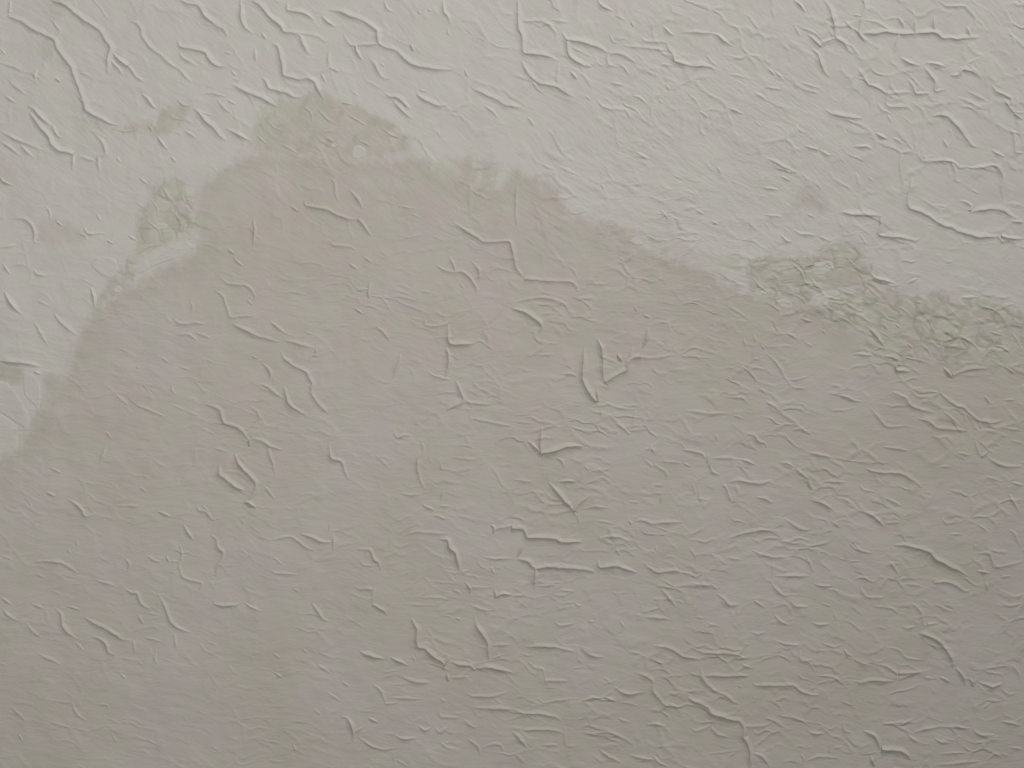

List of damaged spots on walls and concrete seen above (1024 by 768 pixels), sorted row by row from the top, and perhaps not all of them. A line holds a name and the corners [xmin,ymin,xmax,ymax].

leakage [237,78,439,171]
leakage [413,145,481,201]
leakage [531,172,578,226]
leakage [592,213,646,262]
leakage [613,222,745,283]
peeling [734,232,1024,381]
leakage [0,362,83,444]